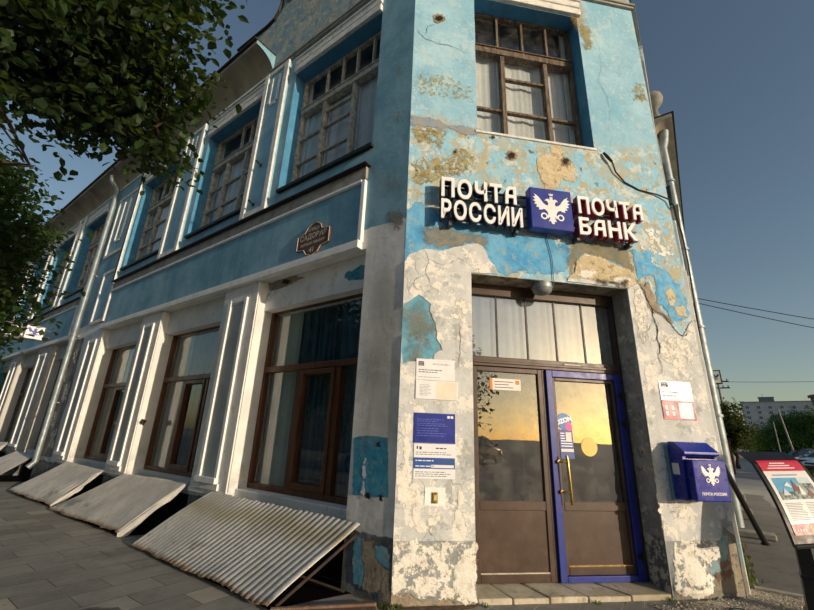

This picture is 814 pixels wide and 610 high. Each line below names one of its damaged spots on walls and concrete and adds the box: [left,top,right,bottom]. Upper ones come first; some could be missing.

corrosion [577,6,592,49]
peeling [416,73,471,99]
peeling [537,145,577,189]
peeling [405,201,694,342]
peeling [401,281,442,363]
crack [637,281,688,370]
peeling [644,337,694,391]
peeling [352,416,478,607]
peeling [653,444,692,535]
peeling [673,527,746,600]